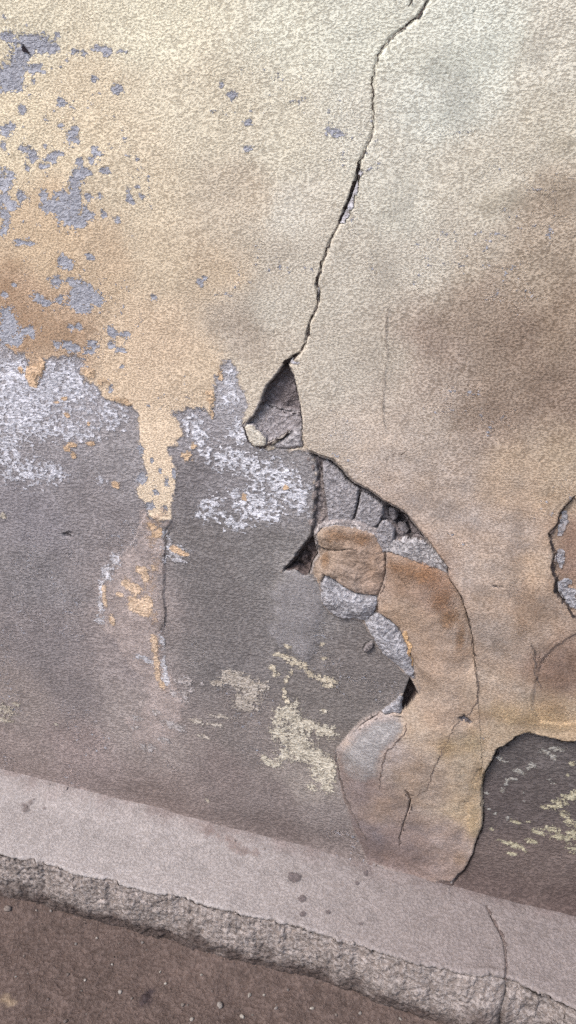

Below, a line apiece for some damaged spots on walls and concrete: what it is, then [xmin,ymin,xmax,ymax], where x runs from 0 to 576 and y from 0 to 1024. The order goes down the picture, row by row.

crack [282,0,429,364]
water stain [0,355,129,492]
peeling [0,11,447,867]
water stain [182,368,311,534]
crack [354,711,407,789]
crack [398,558,479,847]
flaking render [437,733,576,916]
crack [486,906,507,981]